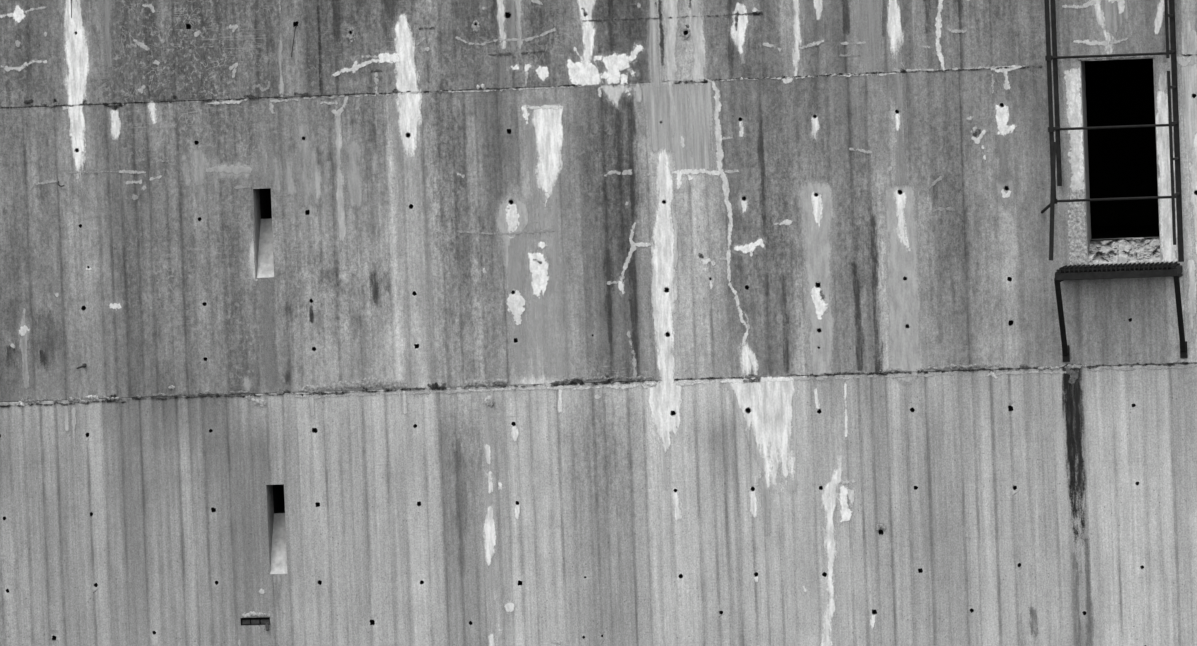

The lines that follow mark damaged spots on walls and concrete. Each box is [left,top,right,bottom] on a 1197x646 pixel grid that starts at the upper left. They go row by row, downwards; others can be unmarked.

water stain [64,0,89,210]
water stain [332,0,422,157]
water stain [496,101,567,378]
efflorescence [573,0,596,63]
crack [0,0,1195,408]
water stain [603,250,613,342]
water stain [615,0,720,488]
water stain [736,126,765,214]
water stain [721,180,835,535]
efflorescence [821,457,855,646]